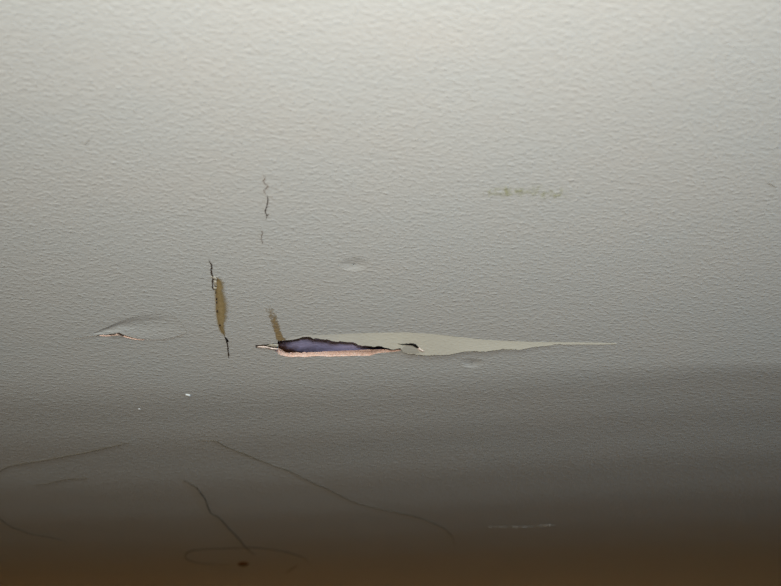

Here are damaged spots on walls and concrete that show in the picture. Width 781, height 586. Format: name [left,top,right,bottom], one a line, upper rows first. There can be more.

crack [209,262,229,358]
peeling [282,332,617,356]